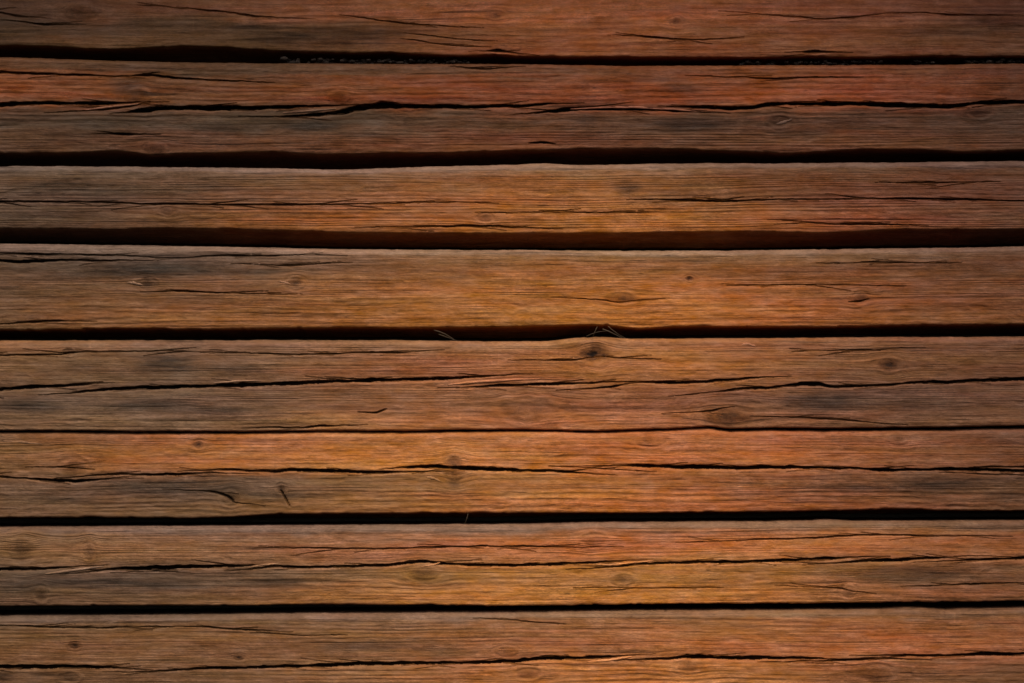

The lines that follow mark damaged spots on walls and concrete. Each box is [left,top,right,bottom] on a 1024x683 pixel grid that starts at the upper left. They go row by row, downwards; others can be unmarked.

crack [0,69,1024,135]
crack [0,320,1024,425]
crack [0,461,1024,506]
crack [0,532,1024,594]
crack [0,623,1024,675]